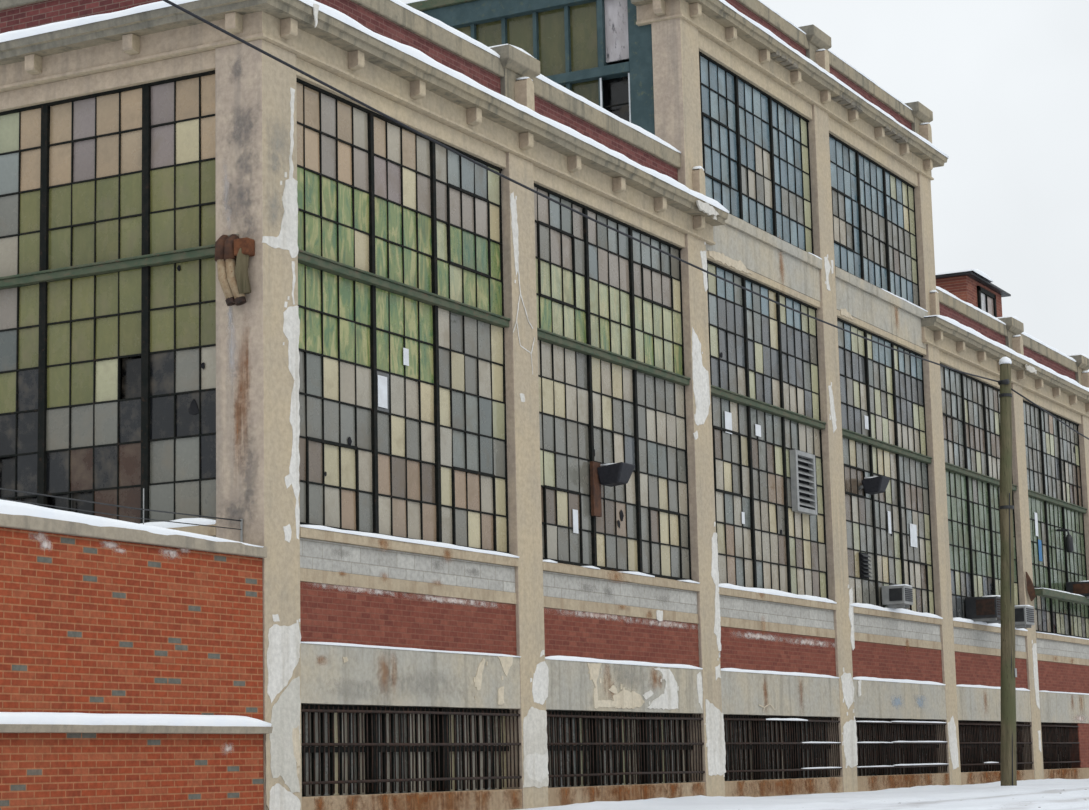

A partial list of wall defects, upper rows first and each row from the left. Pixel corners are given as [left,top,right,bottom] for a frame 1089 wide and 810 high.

peeling [262,87,300,542]
rust [236,350,248,444]
peeling [692,327,710,440]
peeling [267,614,301,703]
flaking render [523,650,549,788]
flaking render [587,663,679,710]
flaking render [840,668,861,768]
rust [372,791,487,810]
rust [590,784,677,802]
rust [760,779,813,794]
rust [889,775,930,787]
rust [968,771,1001,784]